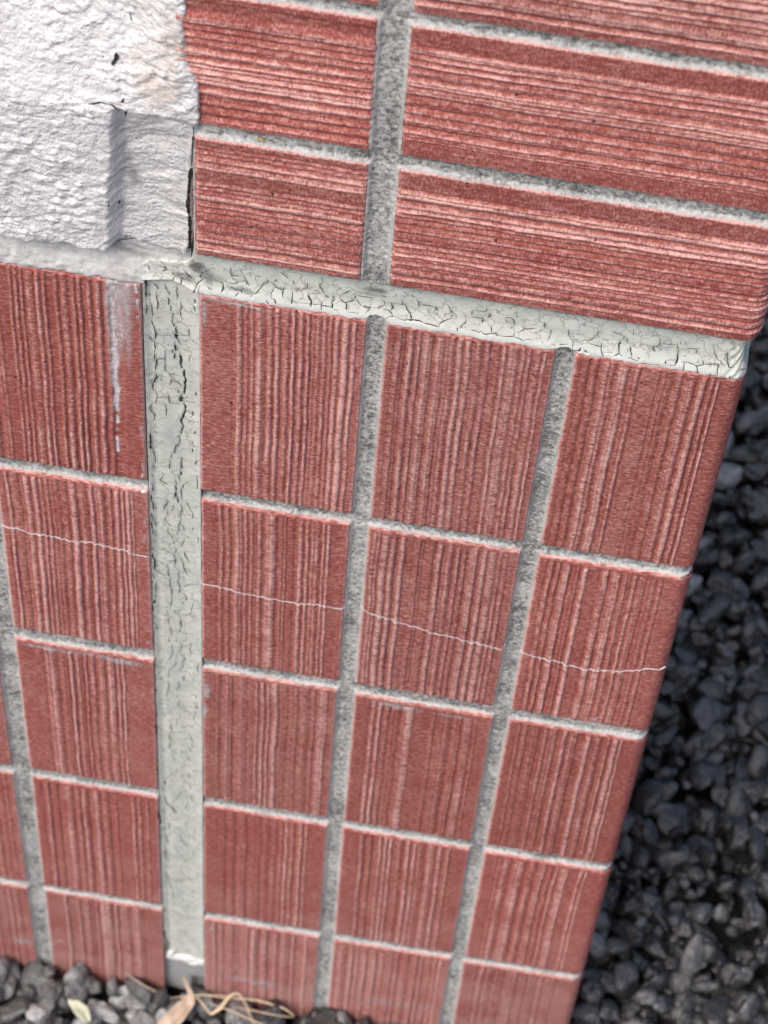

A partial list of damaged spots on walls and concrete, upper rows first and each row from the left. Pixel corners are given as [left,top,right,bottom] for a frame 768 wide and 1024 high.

crack [2,127,748,954]